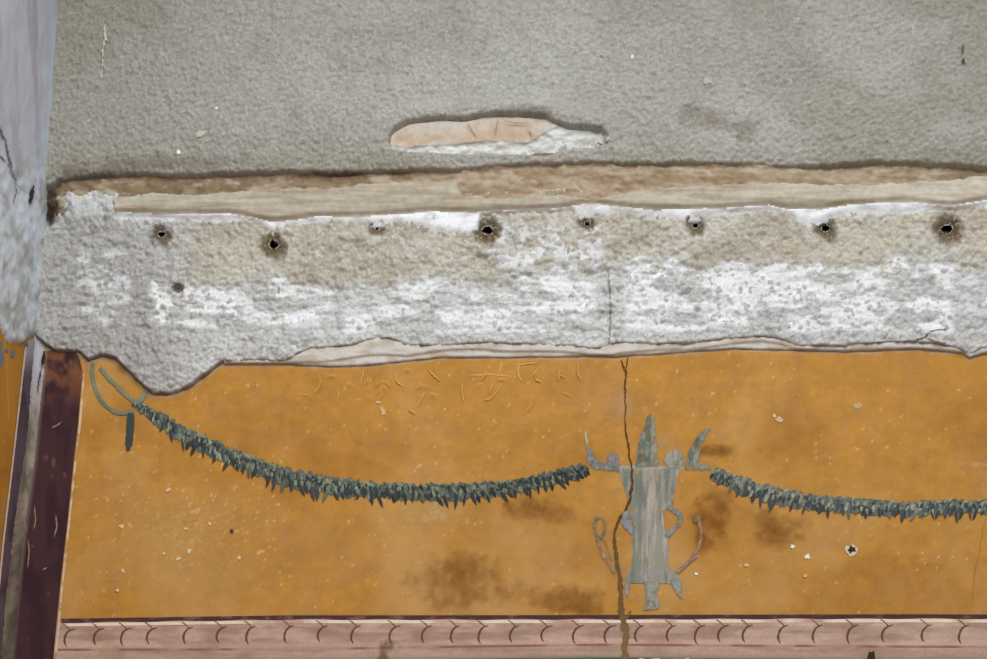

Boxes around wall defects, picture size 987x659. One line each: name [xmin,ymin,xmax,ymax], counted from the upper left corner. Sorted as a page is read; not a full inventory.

crack [0,127,35,204]
spalling [391,126,605,155]
spalling [35,190,987,396]
crack [608,269,634,659]